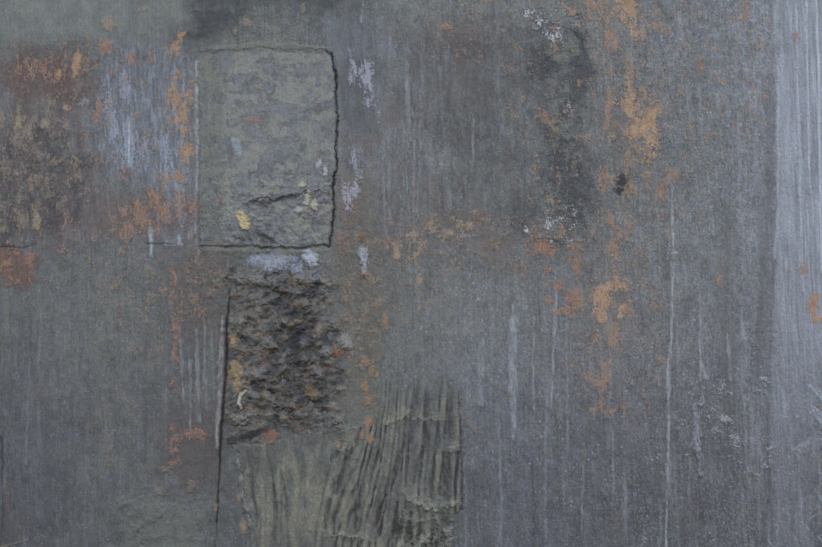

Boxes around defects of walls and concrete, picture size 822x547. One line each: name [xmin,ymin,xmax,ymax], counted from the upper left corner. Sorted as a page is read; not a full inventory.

peeling [0,25,210,259]
corrosion [0,14,245,514]
crack [214,289,231,547]
peeling [234,208,252,231]
crack [195,0,340,251]
spalling [201,217,355,463]
spalling [372,498,455,547]
corrosion [322,0,788,445]